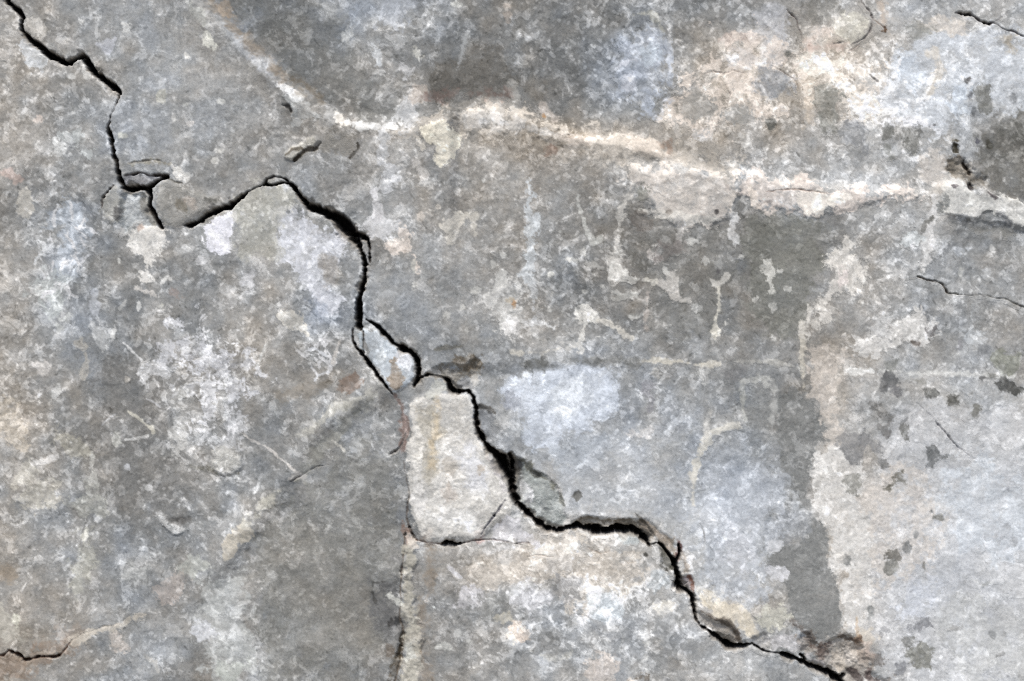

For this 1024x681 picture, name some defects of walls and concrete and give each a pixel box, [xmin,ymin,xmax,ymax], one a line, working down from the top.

crack [785,8,805,42]
crack [832,0,888,52]
crack [954,10,1024,41]
crack [867,74,880,86]
crack [0,0,427,396]
crack [765,184,829,196]
crack [900,274,1024,313]
crack [388,397,411,456]
crack [400,371,851,681]
crack [398,534,406,573]
crack [0,627,100,664]
crack [391,606,405,681]